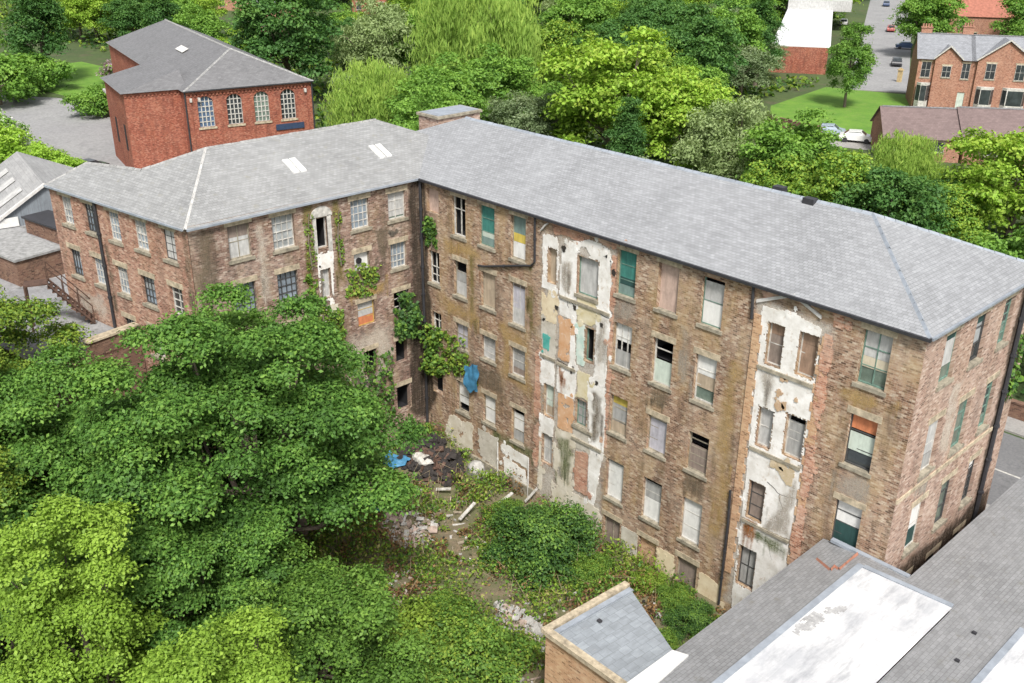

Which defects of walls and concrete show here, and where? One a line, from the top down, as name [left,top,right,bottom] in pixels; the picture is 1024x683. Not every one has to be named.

flaking render [445,224,627,530]
water stain [592,393,603,440]
flaking render [696,290,853,608]